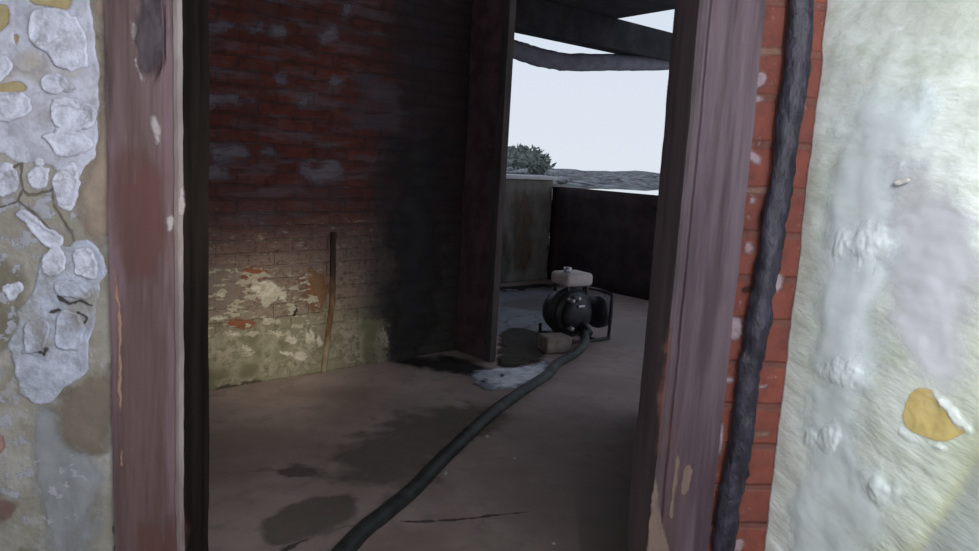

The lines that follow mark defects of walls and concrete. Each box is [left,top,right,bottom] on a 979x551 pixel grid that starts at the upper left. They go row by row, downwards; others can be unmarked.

peeling [151,116,161,142]
crack [0,162,75,240]
peeling [0,0,122,499]
peeling [208,262,323,370]
peeling [789,92,979,551]
peeling [0,459,42,521]
damp [264,495,354,544]
crack [405,512,523,523]